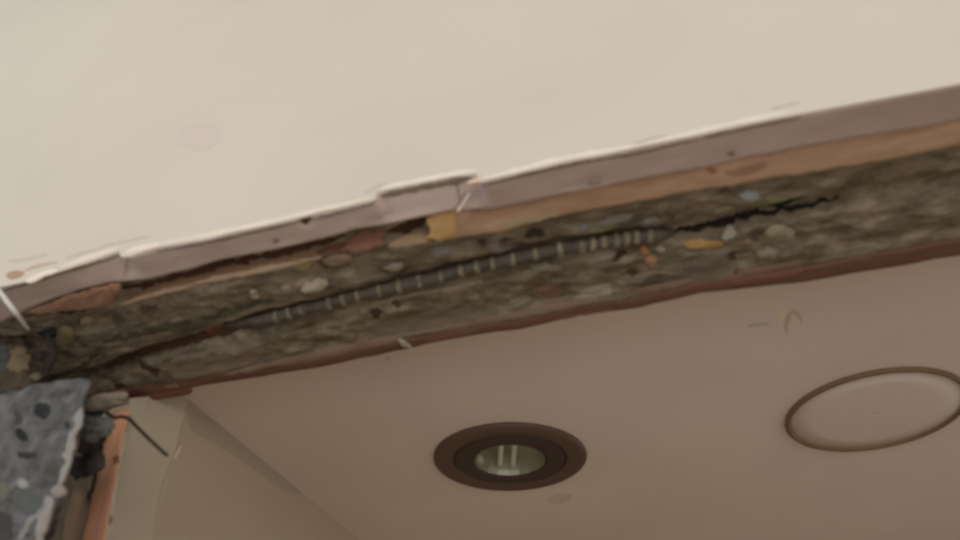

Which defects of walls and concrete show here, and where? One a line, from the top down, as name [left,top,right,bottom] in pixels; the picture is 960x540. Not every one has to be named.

flaking render [380,109,802,189]
flaking render [6,197,370,284]
crack [1,101,802,291]
spalling [223,208,679,329]
crack [675,195,839,233]
peeling [13,384,131,485]
flaking render [17,496,55,540]